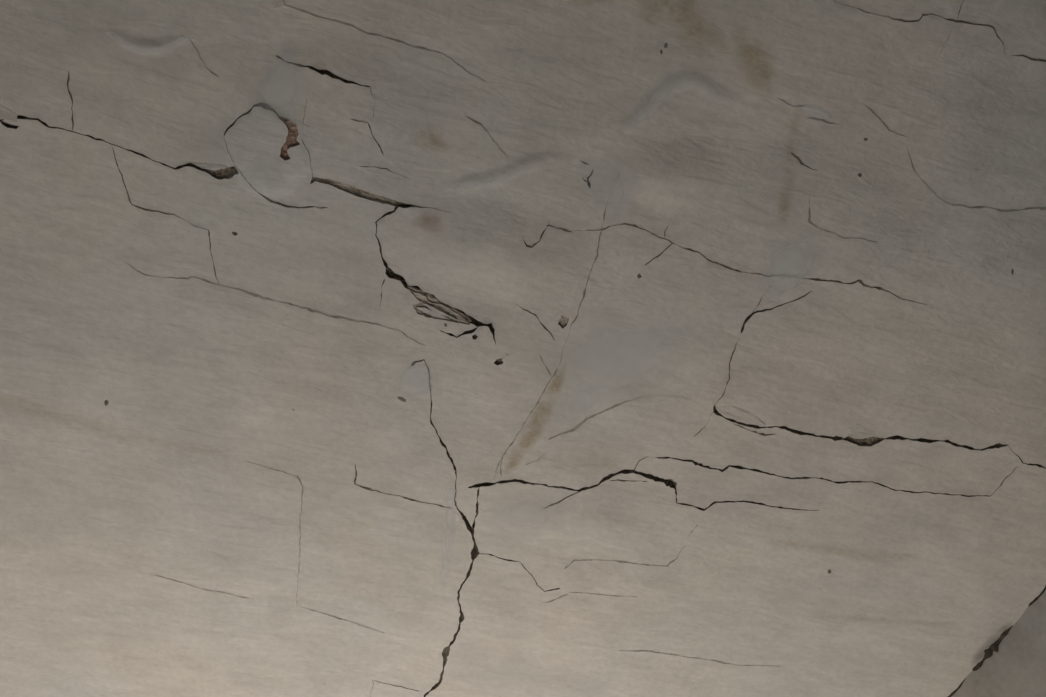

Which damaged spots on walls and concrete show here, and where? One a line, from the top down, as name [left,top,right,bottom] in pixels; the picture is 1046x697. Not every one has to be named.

crack [268,0,487,83]
crack [834,0,1046,62]
spalling [278,117,300,160]
crack [466,116,508,158]
crack [791,153,815,170]
crack [778,98,838,125]
crack [866,106,1046,212]
crack [0,55,426,346]
crack [354,173,1046,697]
crack [247,461,384,633]
crack [155,575,246,598]